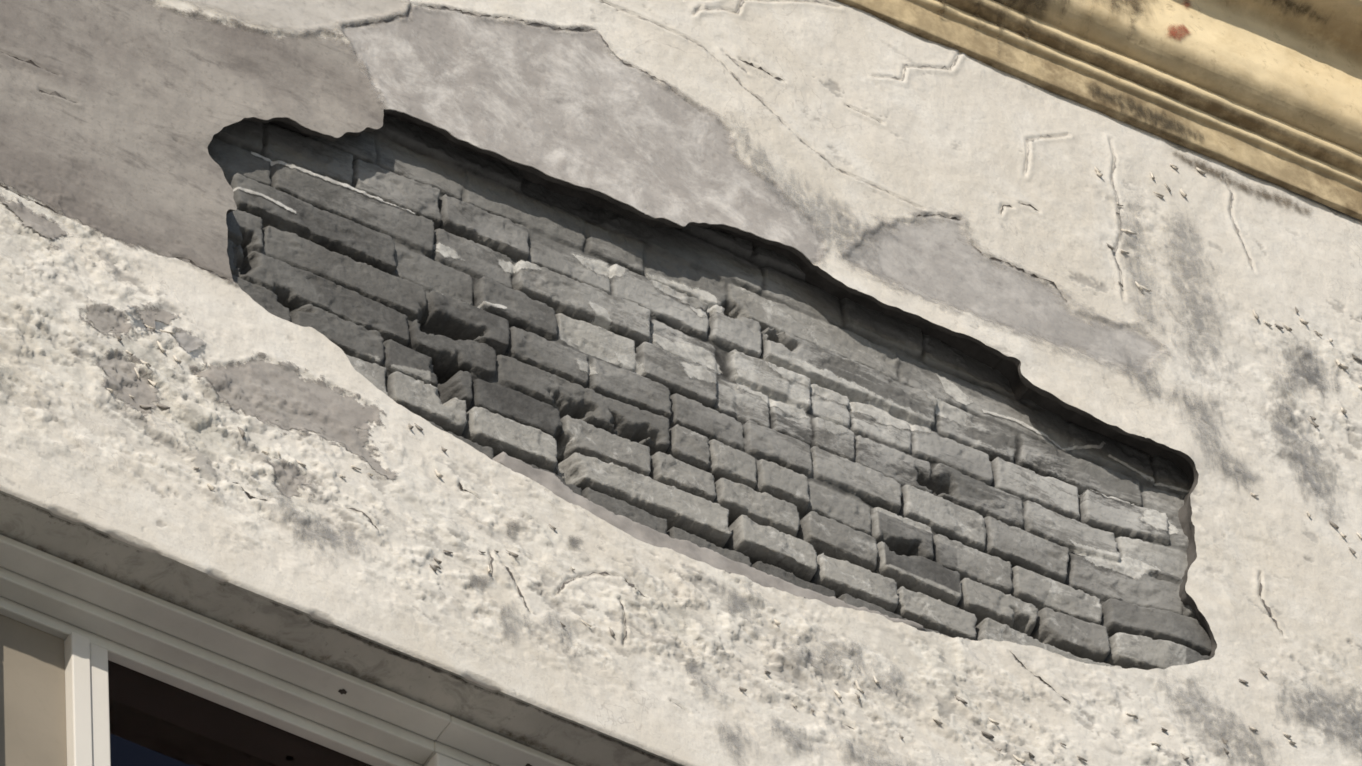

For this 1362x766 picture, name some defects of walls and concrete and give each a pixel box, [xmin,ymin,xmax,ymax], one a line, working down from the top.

crack [345,0,960,220]
water stain [1093,87,1201,138]
water stain [1174,153,1308,212]
crack [976,248,1067,302]
spalling [0,0,1217,670]
peeling [981,717,1035,764]